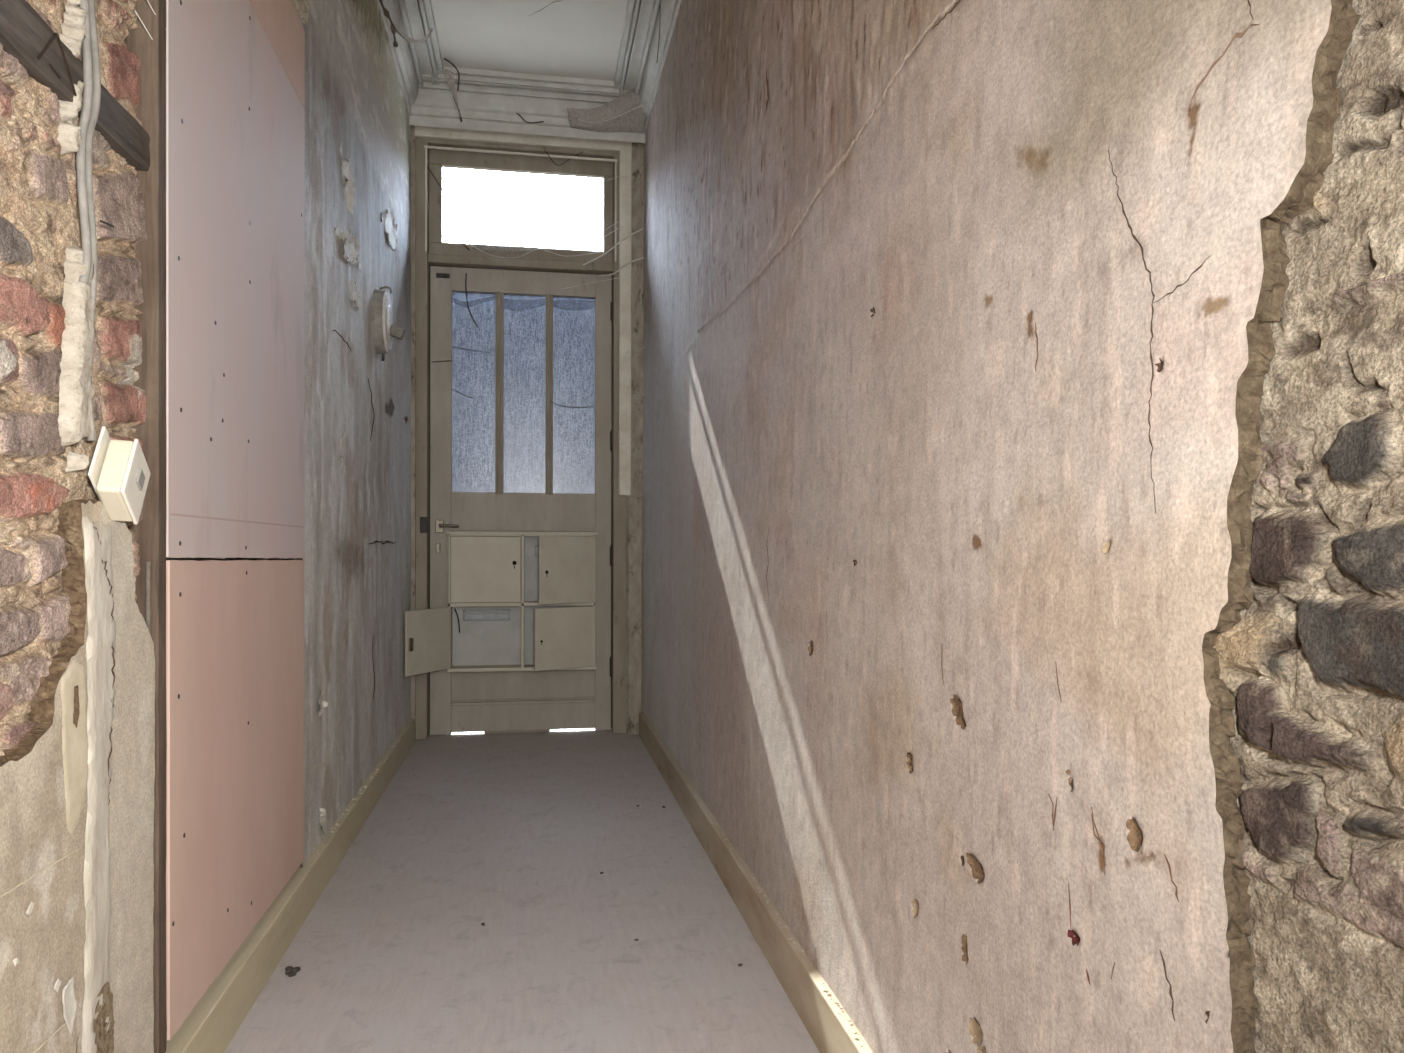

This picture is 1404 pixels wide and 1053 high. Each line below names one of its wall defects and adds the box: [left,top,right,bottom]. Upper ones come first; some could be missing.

flaking render [26,0,142,126]
crack [1188,0,1259,116]
crack [1108,150,1210,513]
flaking render [0,43,147,834]
flaking render [1202,0,1404,1053]
peeling [54,977,77,1034]
spalling [93,982,115,1053]